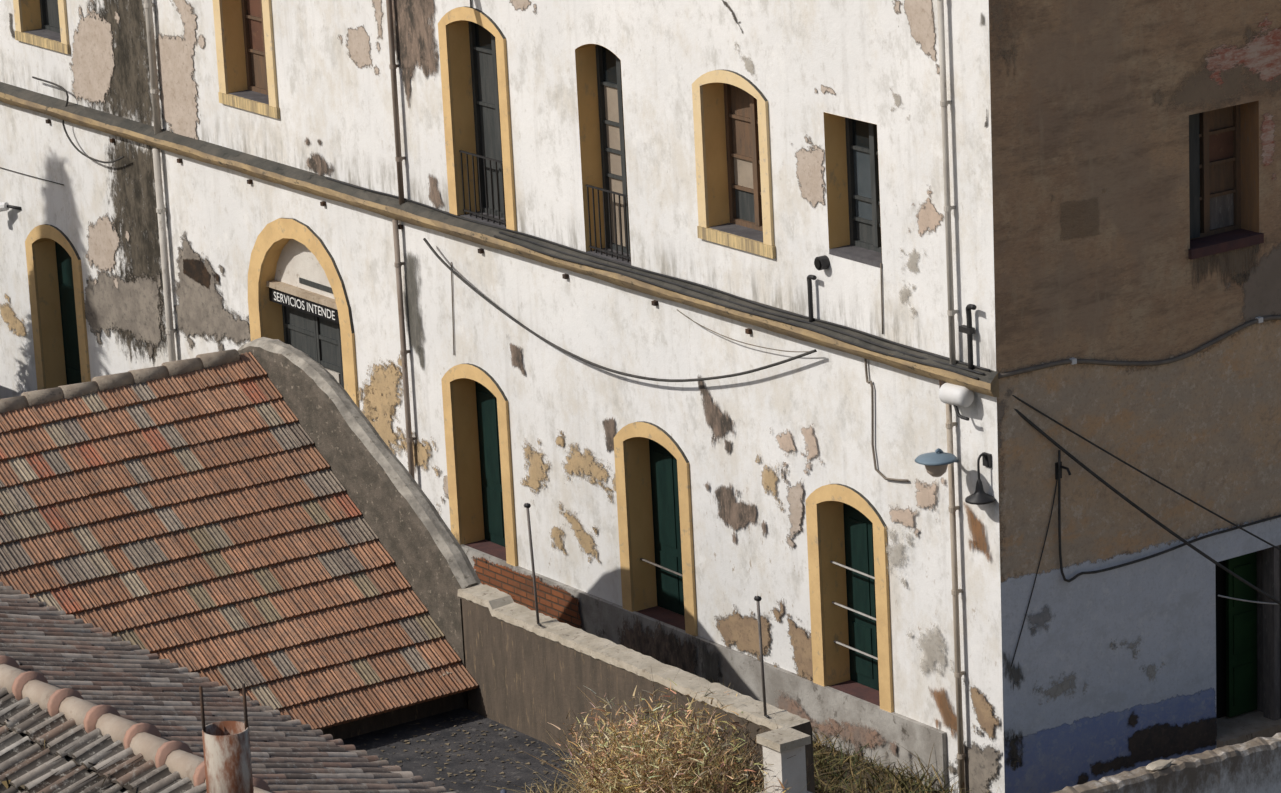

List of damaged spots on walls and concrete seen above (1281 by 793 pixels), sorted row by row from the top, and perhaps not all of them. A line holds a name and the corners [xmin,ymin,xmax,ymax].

flaking render [69,0,120,106]
leakage [88,0,166,130]
flaking render [155,0,205,140]
leakage [392,0,438,108]
flaking render [893,0,940,75]
spalling [1205,13,1281,86]
flaking render [791,136,826,208]
leakage [108,137,168,364]
flaking render [357,354,449,505]
flaking render [520,417,616,502]
flaking render [705,424,823,548]
flaking render [714,600,813,682]